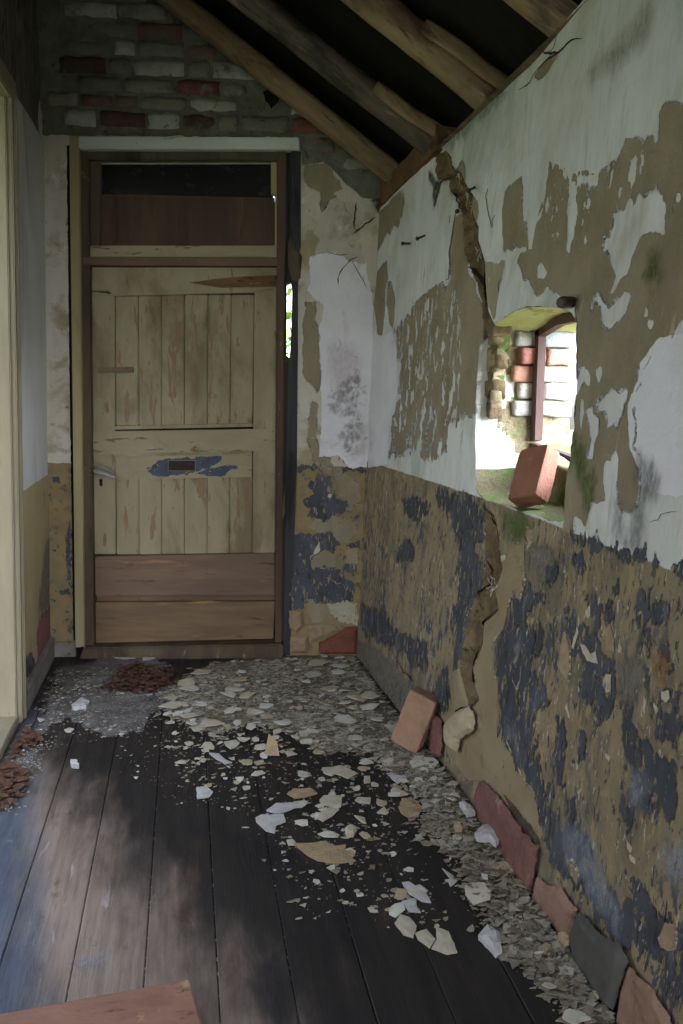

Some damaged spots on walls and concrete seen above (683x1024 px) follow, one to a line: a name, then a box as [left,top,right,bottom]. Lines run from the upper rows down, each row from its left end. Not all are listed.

crack [519,28,582,90]
crack [332,201,376,286]
crack [435,151,499,340]
peeling [52,521,72,595]
peeling [289,100,683,1024]
peeling [26,604,50,678]
crack [446,511,503,712]